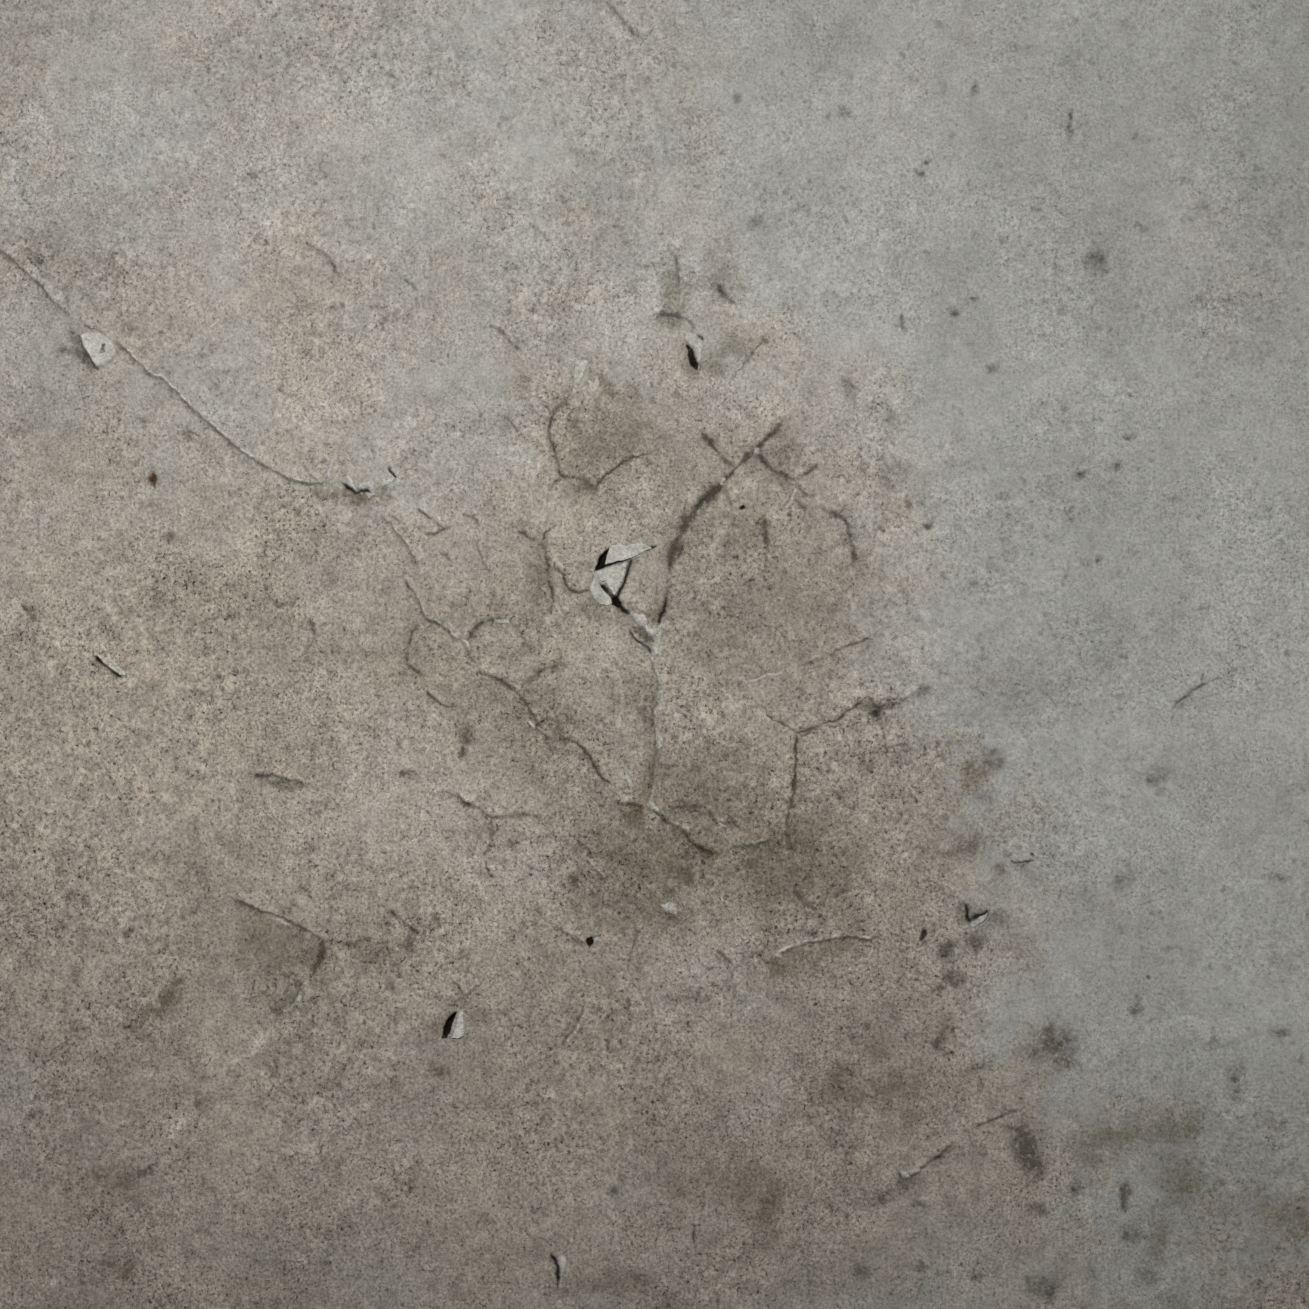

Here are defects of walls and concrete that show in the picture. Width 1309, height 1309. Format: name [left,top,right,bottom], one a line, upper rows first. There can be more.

peeling [61,326,406,504]
crack [549,360,649,489]
crack [669,424,816,567]
peeling [590,543,669,661]
crack [391,513,902,881]
crack [239,899,325,1012]
crack [773,894,872,974]
damp [1012,1127,1043,1171]